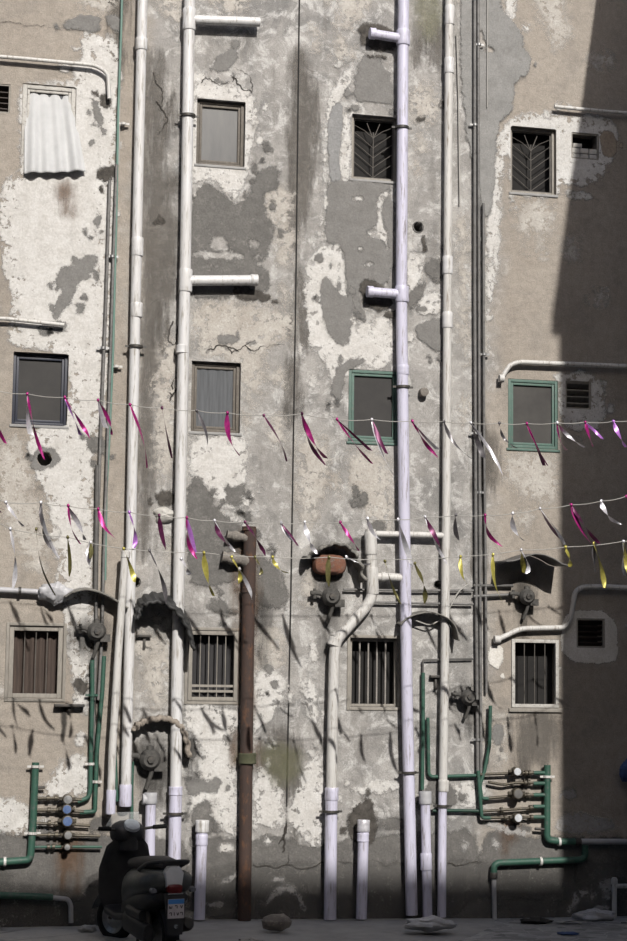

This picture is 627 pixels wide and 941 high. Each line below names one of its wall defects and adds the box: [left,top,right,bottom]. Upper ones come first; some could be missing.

crack [201,69,253,93]
flaking render [191,22,397,409]
peeling [480,101,623,321]
peeling [407,221,443,363]
peeling [0,14,123,715]
crack [208,342,280,354]
peeling [253,664,325,733]
peeling [38,730,88,805]
peeling [183,704,240,853]
leakage [257,730,300,793]
peeling [252,738,326,847]
spalling [338,778,400,844]